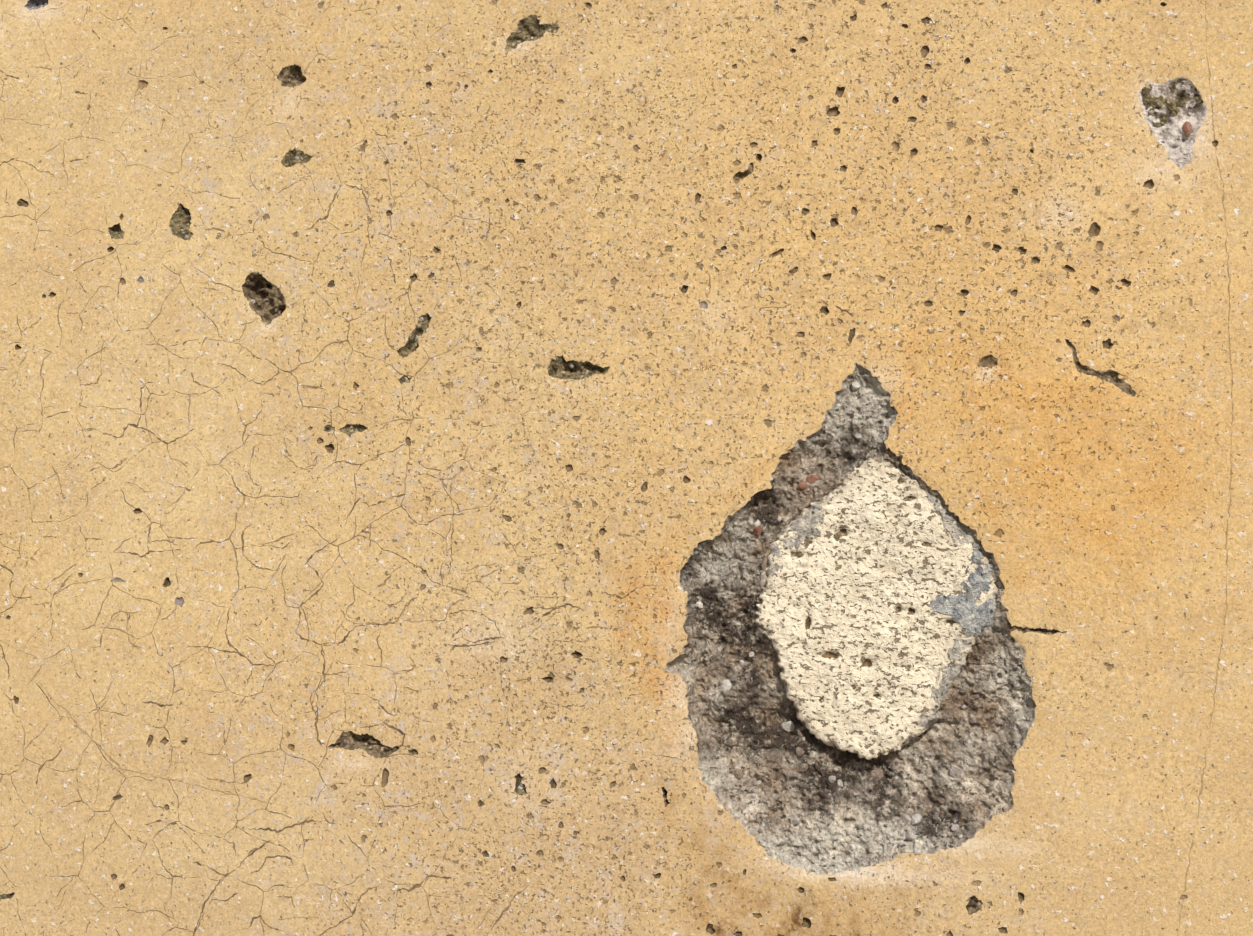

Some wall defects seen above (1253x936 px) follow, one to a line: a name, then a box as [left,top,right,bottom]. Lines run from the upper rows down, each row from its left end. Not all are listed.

crack [0,66,88,99]
peeling [1138,77,1207,170]
crack [0,135,82,207]
crack [305,170,396,284]
spalling [241,272,286,325]
crack [1065,339,1137,397]
crack [0,286,653,750]
spalling [664,362,1036,875]
spalling [328,731,400,758]
crack [36,684,451,936]
crack [487,886,528,936]